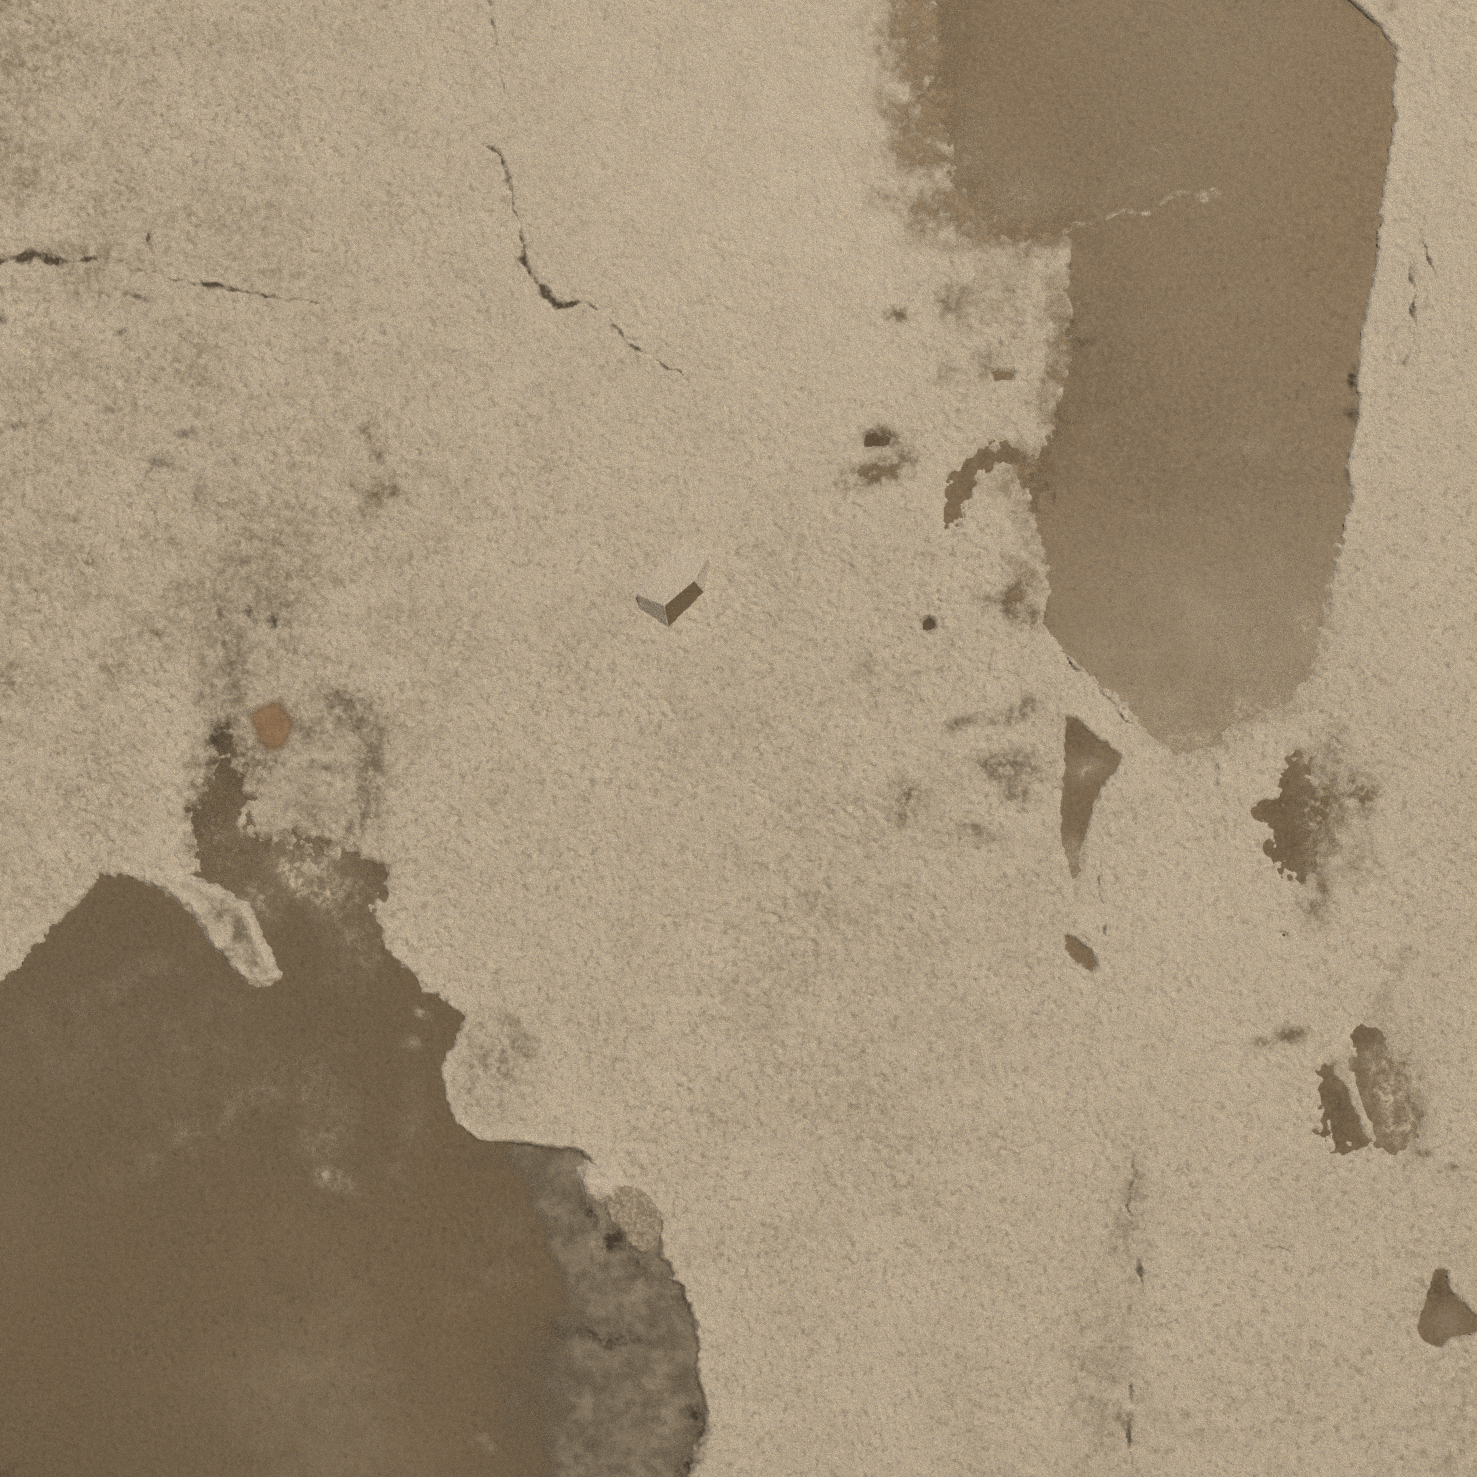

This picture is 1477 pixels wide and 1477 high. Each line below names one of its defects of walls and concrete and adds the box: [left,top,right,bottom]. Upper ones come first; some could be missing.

crack [0,250,96,265]
crack [202,282,270,298]
crack [489,147,682,373]
peeling [882,0,1396,756]
spalling [1060,717,1121,879]
spalling [1250,749,1342,889]
peeling [0,722,709,1477]
spalling [1312,1024,1425,1156]
spalling [1417,1269,1477,1347]